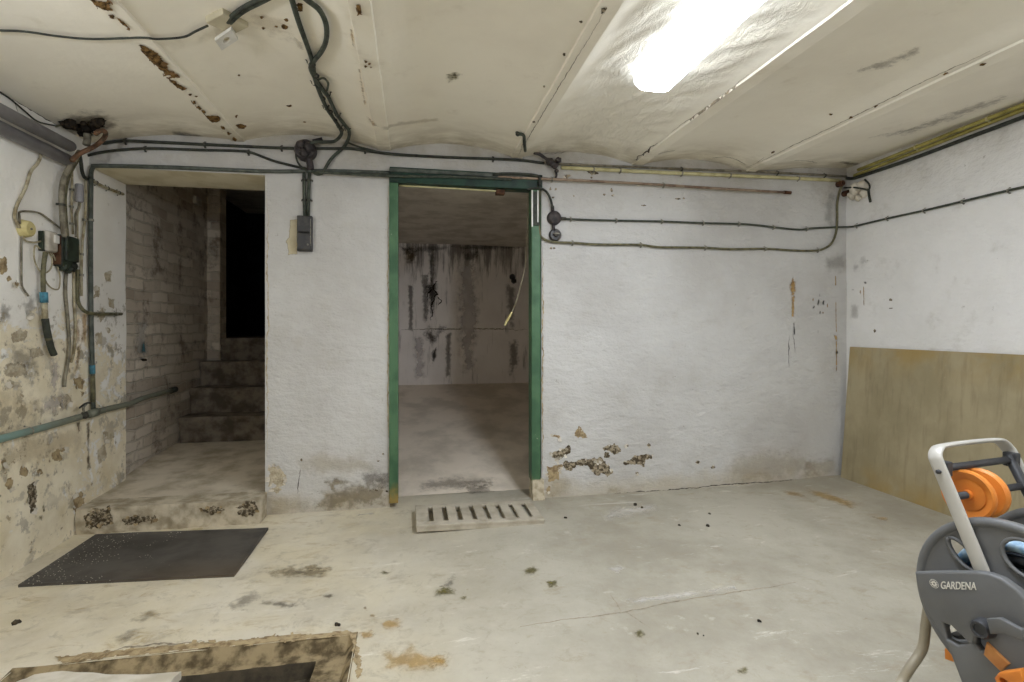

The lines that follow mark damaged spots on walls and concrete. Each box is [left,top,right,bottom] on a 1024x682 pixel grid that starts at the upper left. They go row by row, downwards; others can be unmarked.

spalling [138,45,246,141]
peeling [93,271,115,345]
peeling [4,312,44,390]
flaking render [50,377,87,411]
flaking render [541,247,653,494]
peeling [96,429,114,464]
peeling [1,460,43,514]
spalling [73,491,158,529]
spalling [199,500,259,517]
damp [323,479,383,508]